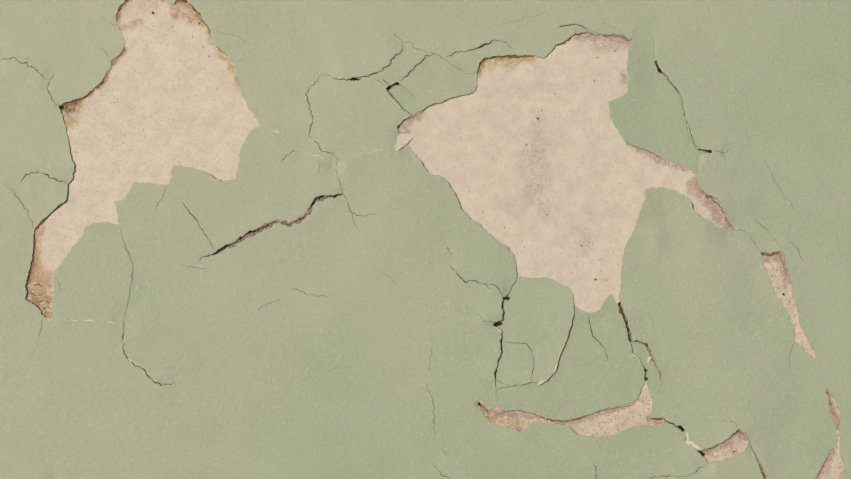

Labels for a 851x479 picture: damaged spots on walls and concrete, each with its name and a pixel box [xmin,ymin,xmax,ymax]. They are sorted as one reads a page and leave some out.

crack [1,57,57,105]
crack [9,172,68,228]
peeling [25,0,259,316]
crack [183,15,537,269]
peeling [395,31,735,313]
crack [655,60,732,153]
crack [64,228,176,386]
peeling [760,251,816,358]
peeling [475,380,665,437]
peeling [702,429,769,479]
peeling [818,388,845,479]